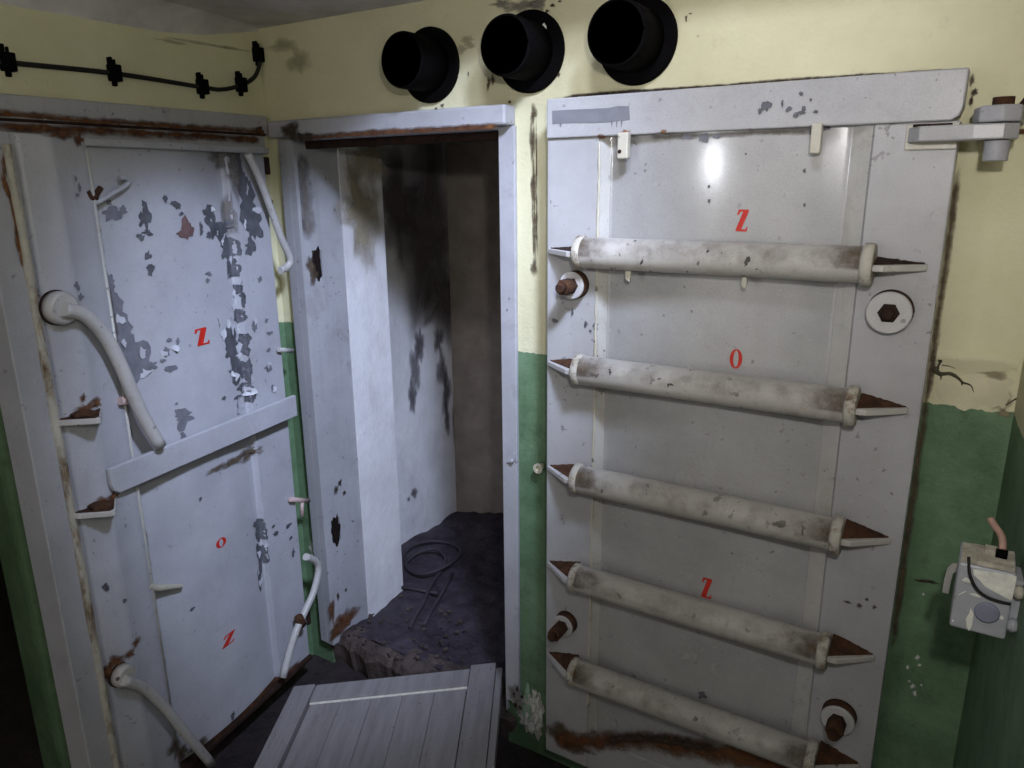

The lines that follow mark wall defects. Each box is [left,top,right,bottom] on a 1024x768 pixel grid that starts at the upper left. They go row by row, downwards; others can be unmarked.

rust [0,110,265,169]
rust [530,125,538,272]
peeling [102,200,155,276]
peeling [162,153,273,414]
peeling [107,274,180,384]
damp [409,330,450,431]
crack [931,357,974,392]
rust [209,447,260,474]
rust [328,601,358,640]
rust [555,731,788,768]